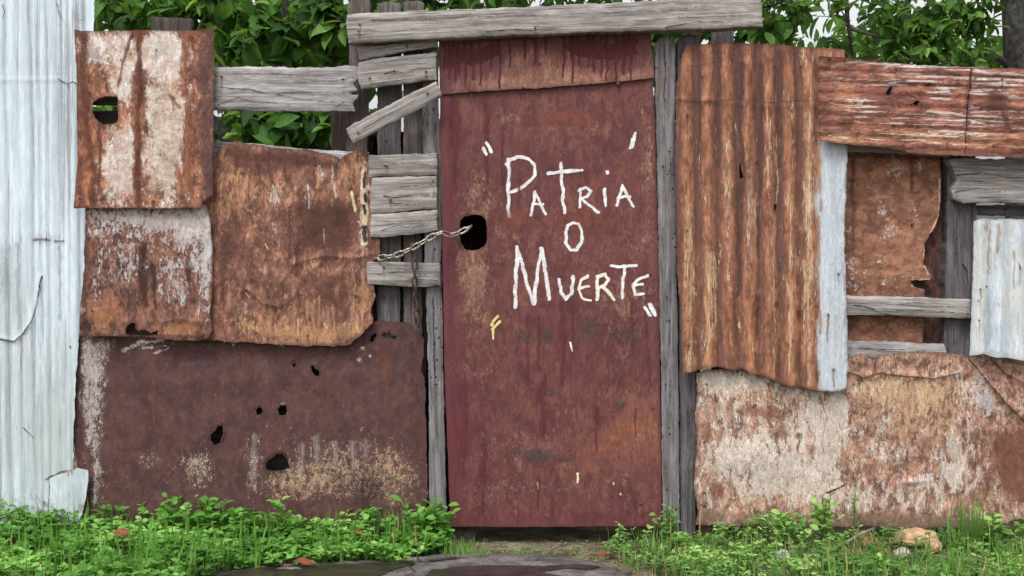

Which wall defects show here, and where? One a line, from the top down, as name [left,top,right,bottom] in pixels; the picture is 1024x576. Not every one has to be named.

rust [78,33,101,206]
rust [104,30,149,206]
rust [138,243,156,309]
rust [168,32,191,193]
rust [226,147,335,182]
rust [294,205,351,275]
rust [735,62,744,296]
rust [756,62,764,257]
rust [816,140,829,342]
rust [180,423,226,489]
rust [744,404,787,438]
rust [972,429,1024,502]